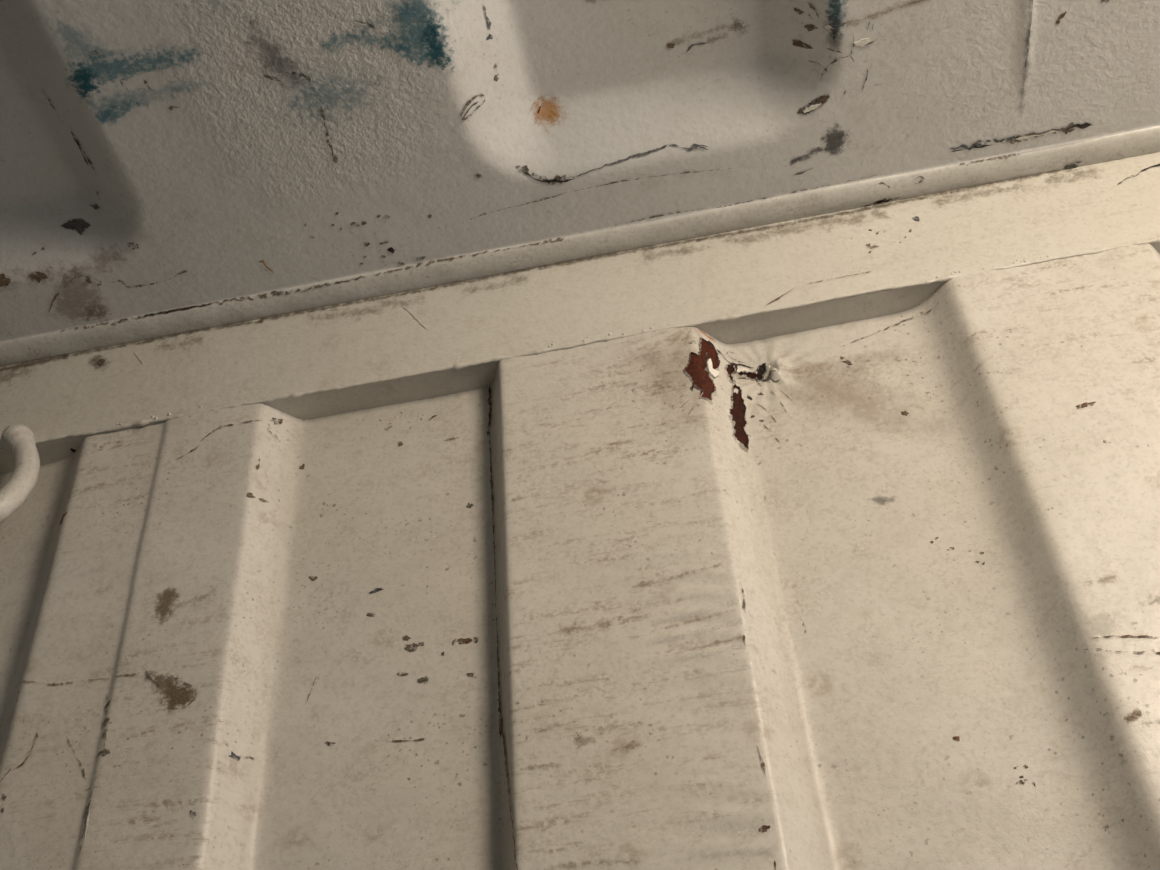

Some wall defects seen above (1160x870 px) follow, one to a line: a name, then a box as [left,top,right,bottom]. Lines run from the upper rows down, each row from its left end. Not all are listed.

peeling [144,669,197,709]